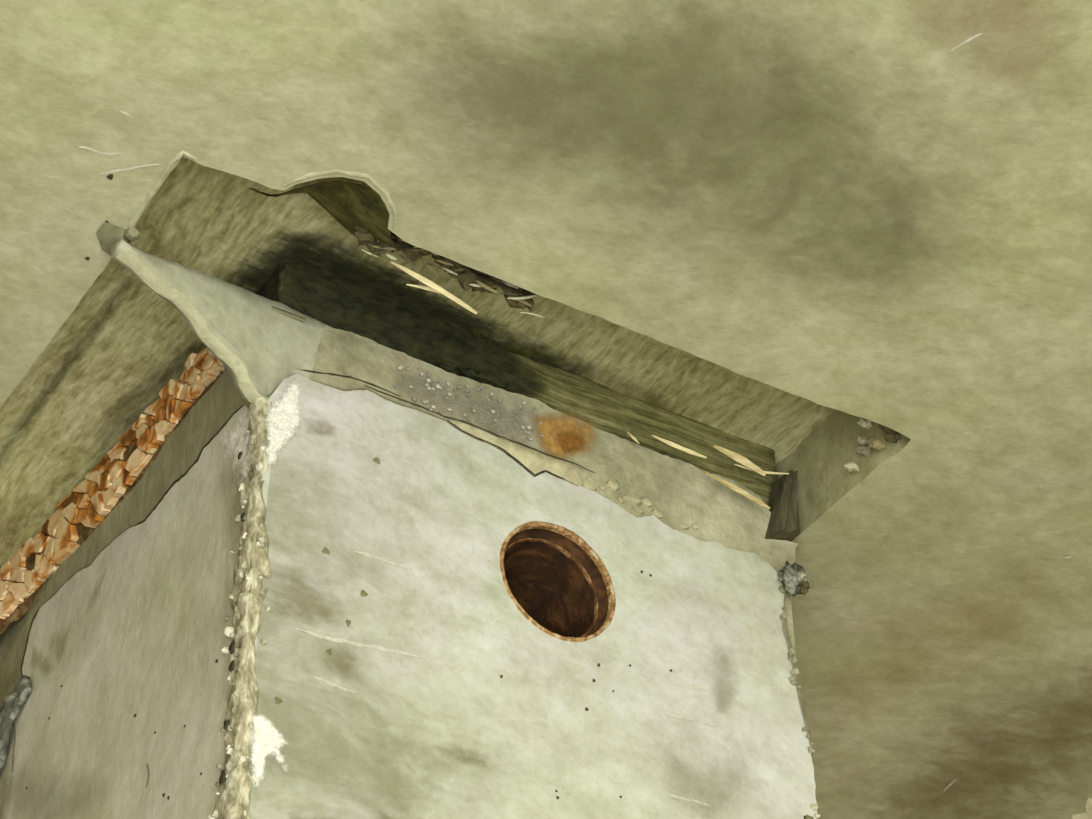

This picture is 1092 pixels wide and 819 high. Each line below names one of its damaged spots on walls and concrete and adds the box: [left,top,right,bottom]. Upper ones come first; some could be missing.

spalling [249,169,544,318]
damp [228,234,578,396]
flaking render [394,365,663,519]
rust [535,415,595,457]
spalling [0,248,276,819]
damp [917,702,1092,816]